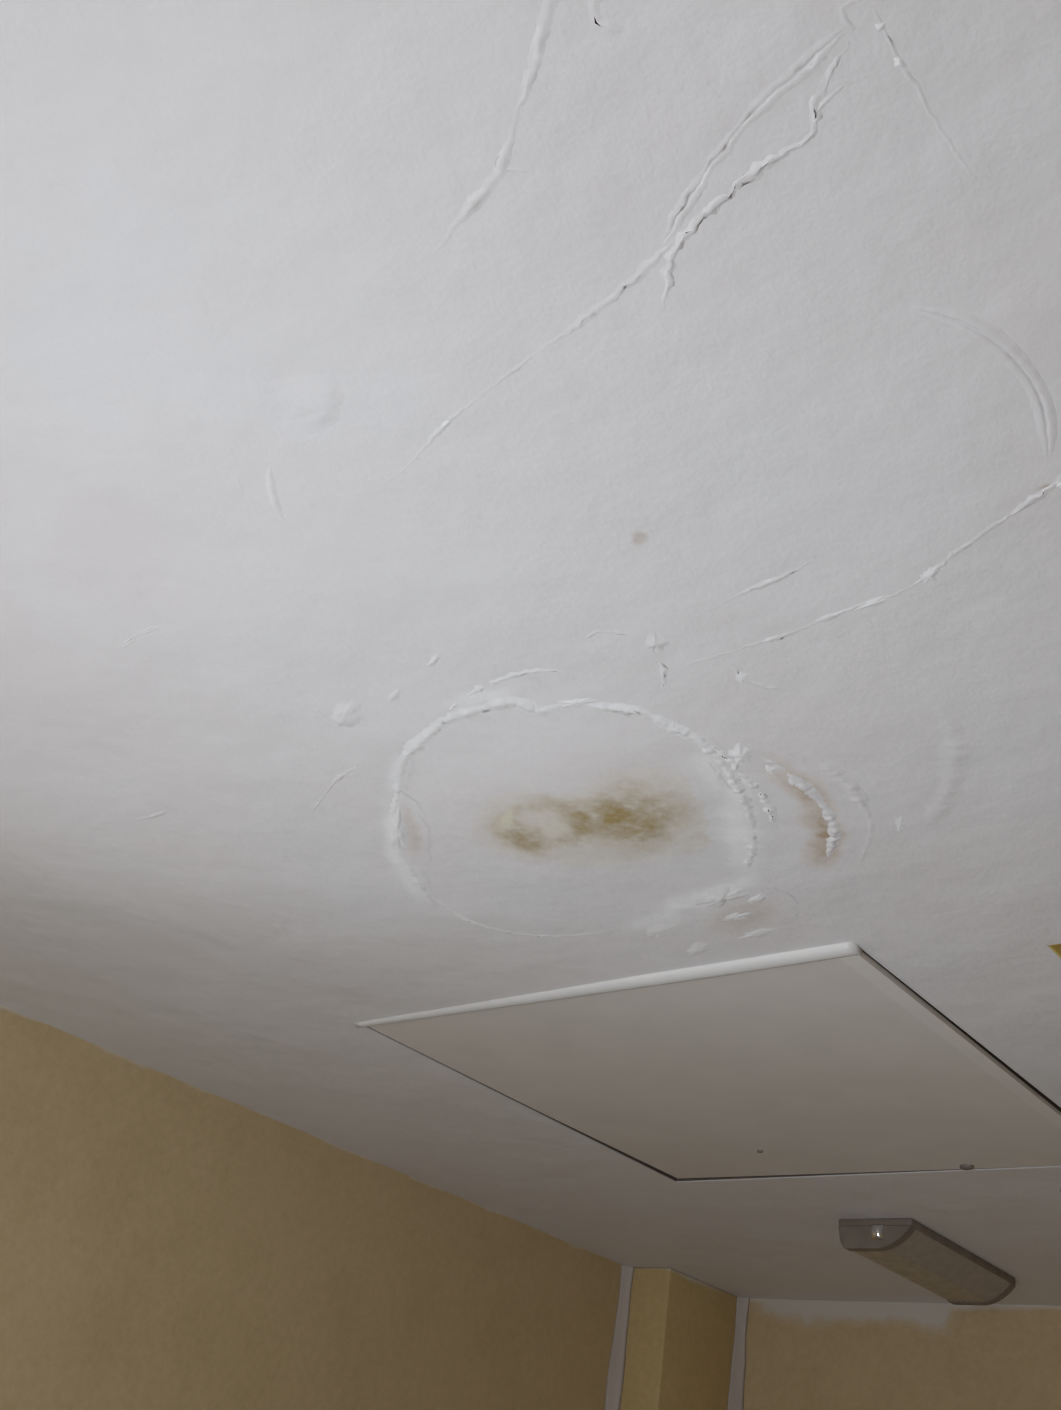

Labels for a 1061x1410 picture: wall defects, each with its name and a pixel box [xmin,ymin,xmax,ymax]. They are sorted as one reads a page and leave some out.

leakage [451,746,716,877]